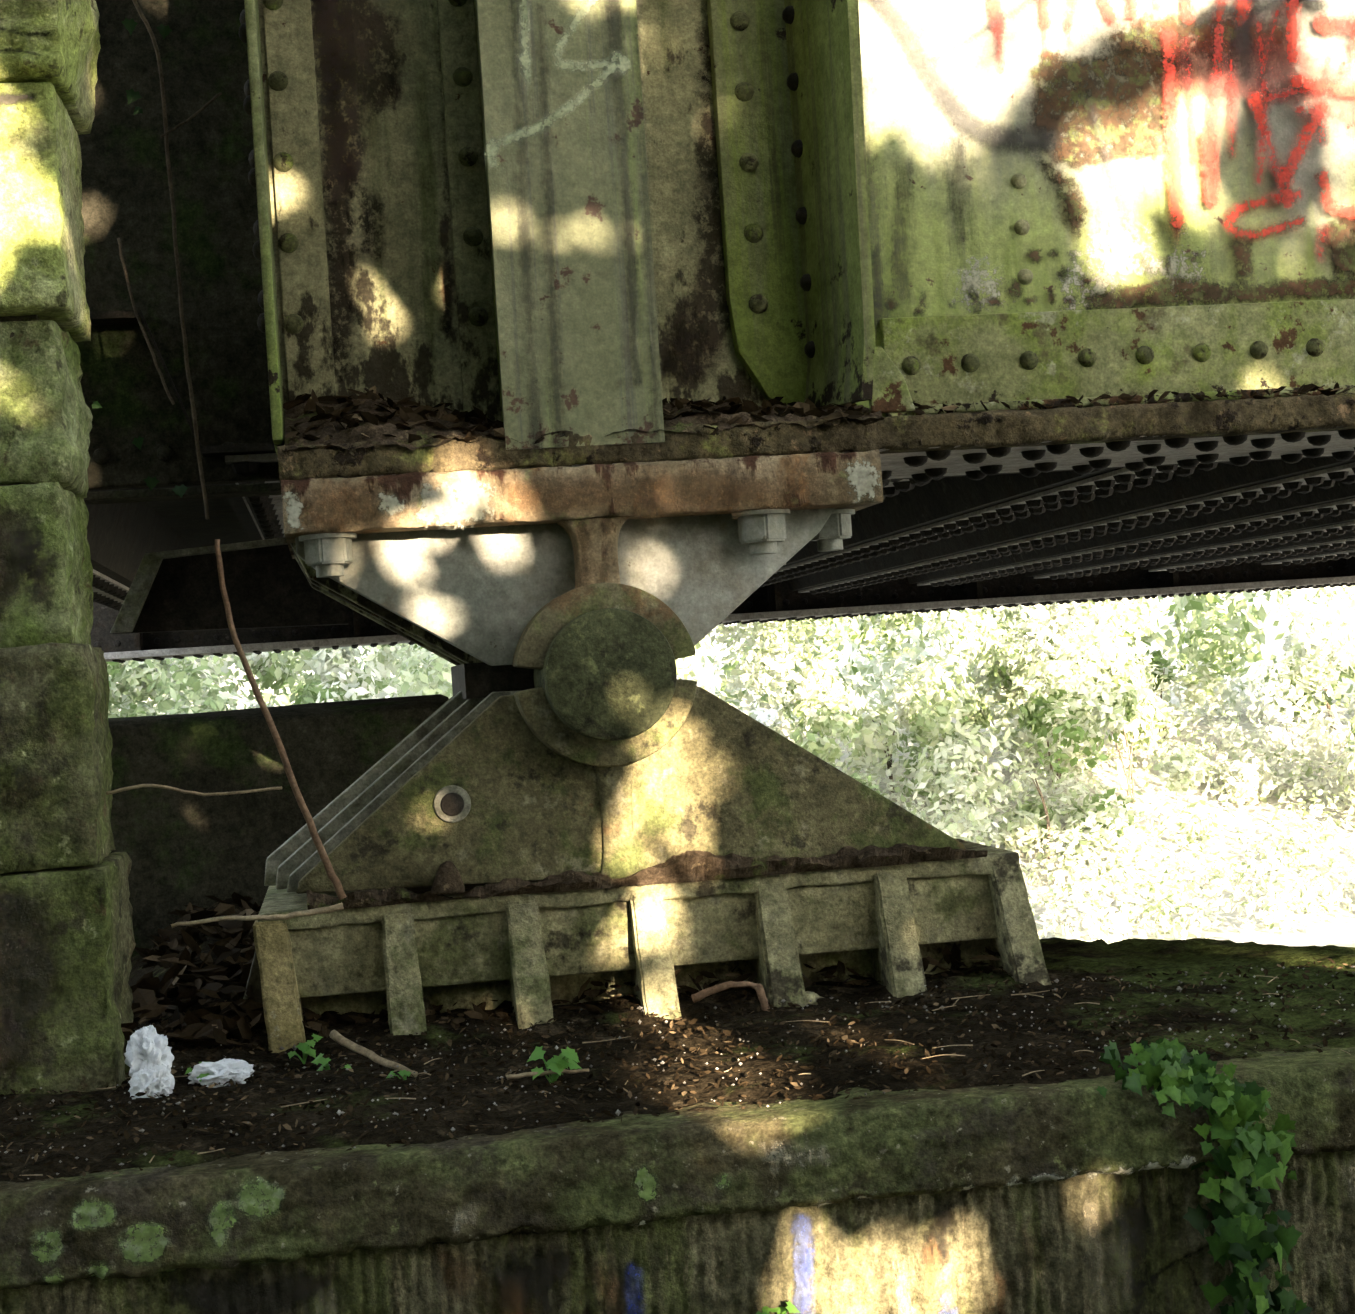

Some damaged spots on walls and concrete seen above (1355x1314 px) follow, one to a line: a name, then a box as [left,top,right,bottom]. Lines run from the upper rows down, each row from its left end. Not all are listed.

corrosion [1030,11,1287,237]
peeling [282,491,303,529]
peeling [379,481,495,528]
peeling [845,461,881,502]